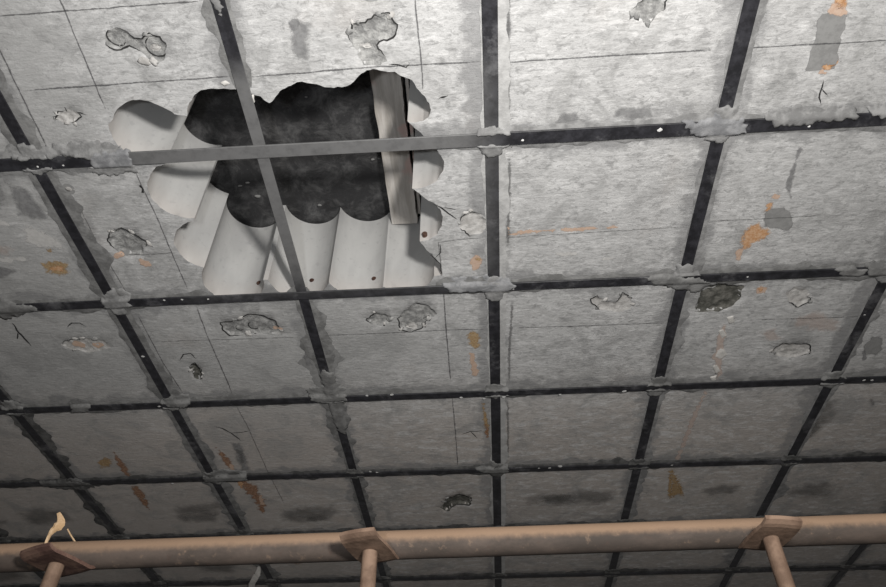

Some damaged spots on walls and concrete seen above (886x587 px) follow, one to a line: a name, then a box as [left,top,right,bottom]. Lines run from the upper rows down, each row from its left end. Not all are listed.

spalling [629,0,667,28]
corrosion [828,0,847,16]
spalling [105,27,167,67]
spalling [345,11,398,65]
corrosion [735,224,770,260]
corrosion [41,249,68,274]
spalling [695,283,744,312]
spalling [220,314,284,336]
spalling [366,303,437,332]
spalling [440,494,473,511]